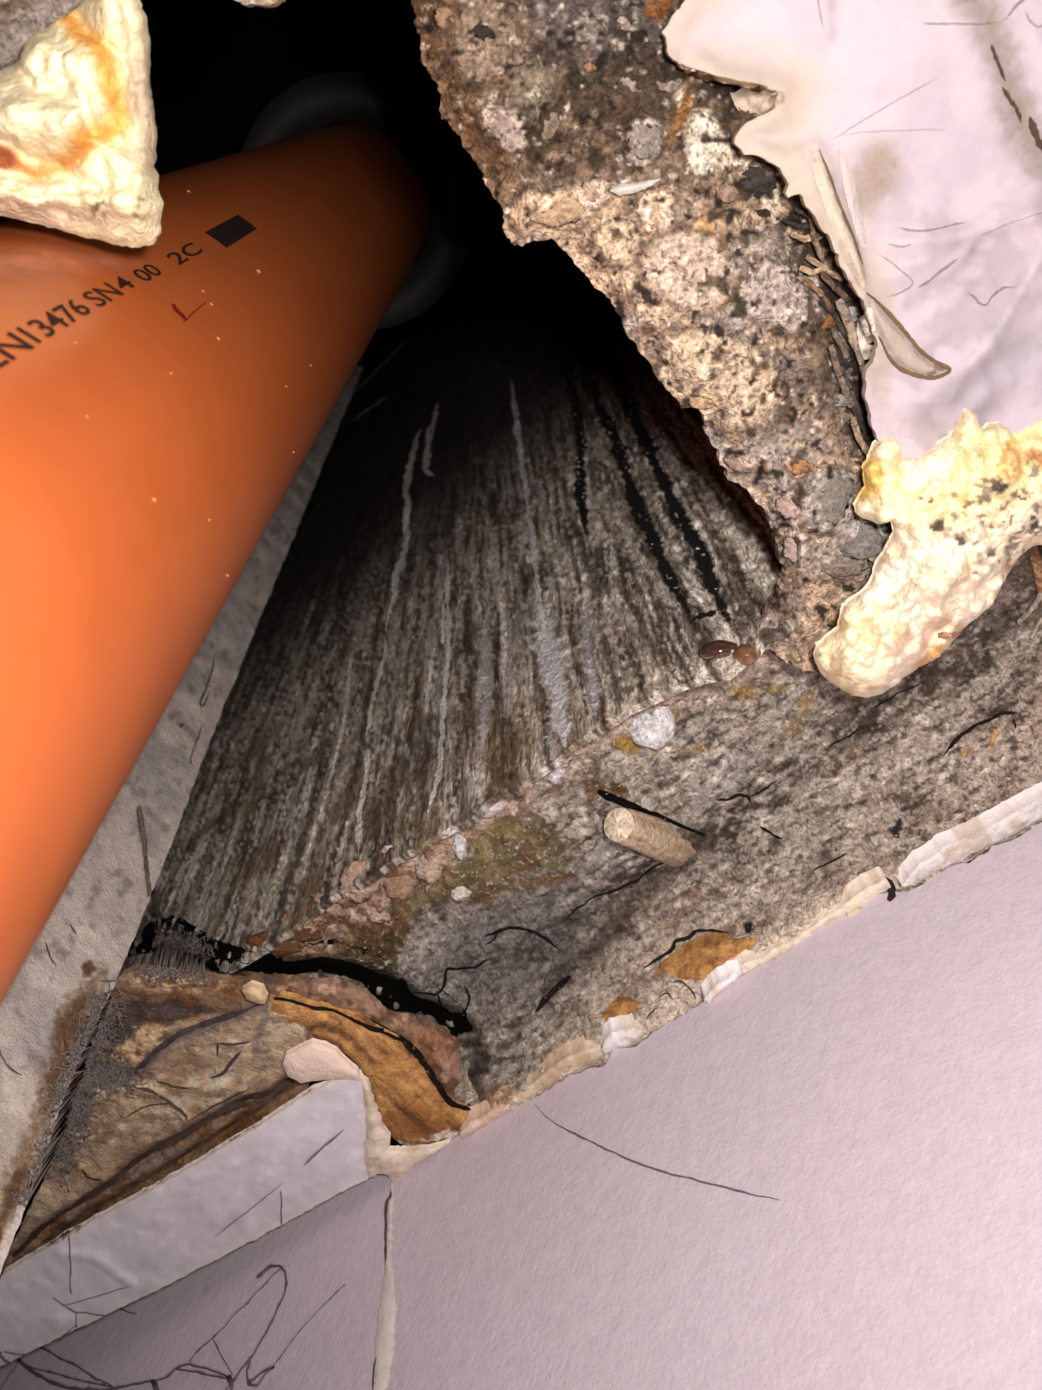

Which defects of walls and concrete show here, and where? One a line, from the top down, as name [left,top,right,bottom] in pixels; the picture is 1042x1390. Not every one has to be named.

spalling [0,0,84,70]
spalling [235,0,285,8]
crack [991,45,1042,150]
efflorescence [355,403,439,854]
efflorescence [427,559,453,813]
damp [476,377,574,756]
damp [578,608,603,716]
spalling [246,0,1042,1117]
crack [412,862,663,1015]
crack [40,997,471,1243]
spalling [397,1128,460,1146]
crack [535,1105,779,1200]